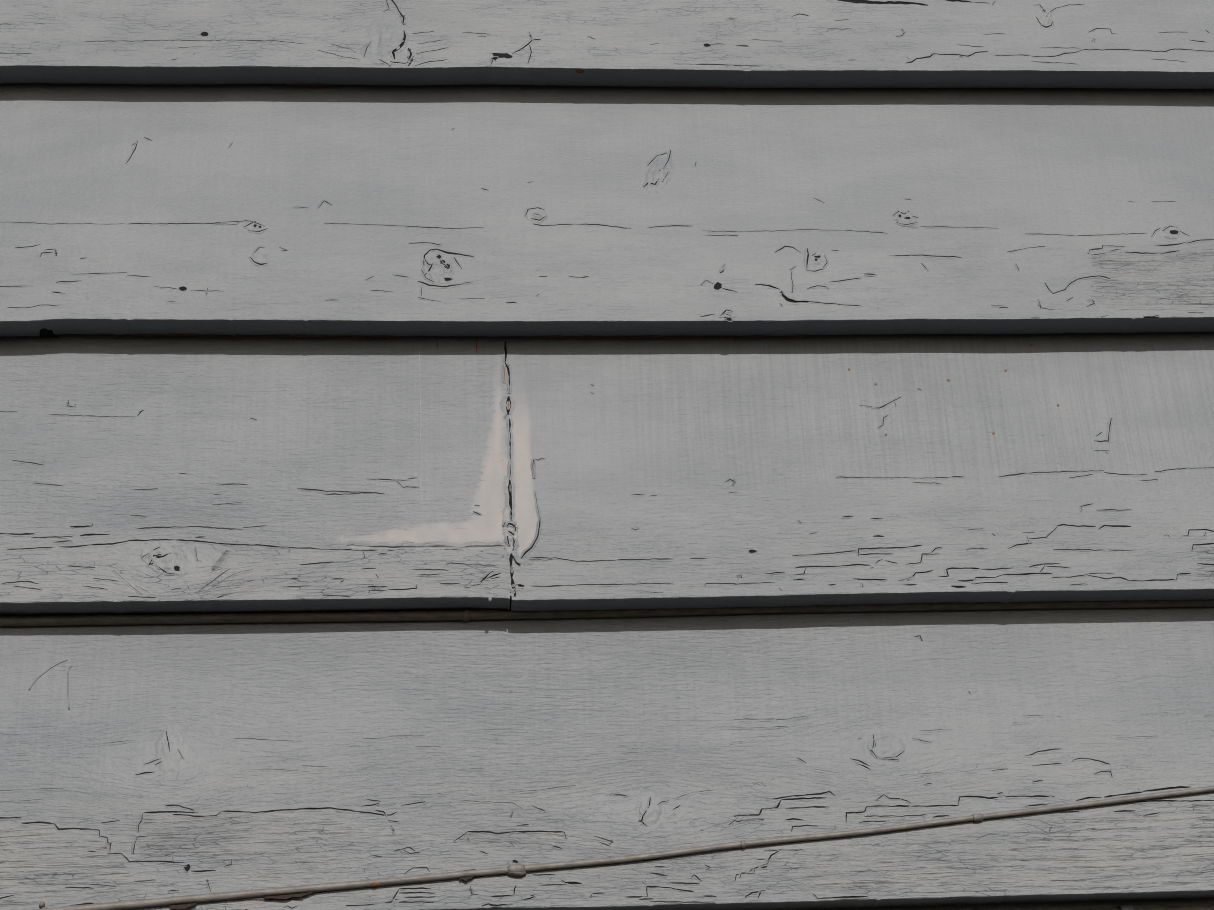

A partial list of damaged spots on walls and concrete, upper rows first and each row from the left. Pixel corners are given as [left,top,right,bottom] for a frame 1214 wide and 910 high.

crack [49,412,137,420]
crack [859,388,922,429]
crack [0,418,1214,599]
crack [135,731,185,777]
crack [453,734,1214,908]
crack [0,798,435,907]
crack [0,893,15,910]